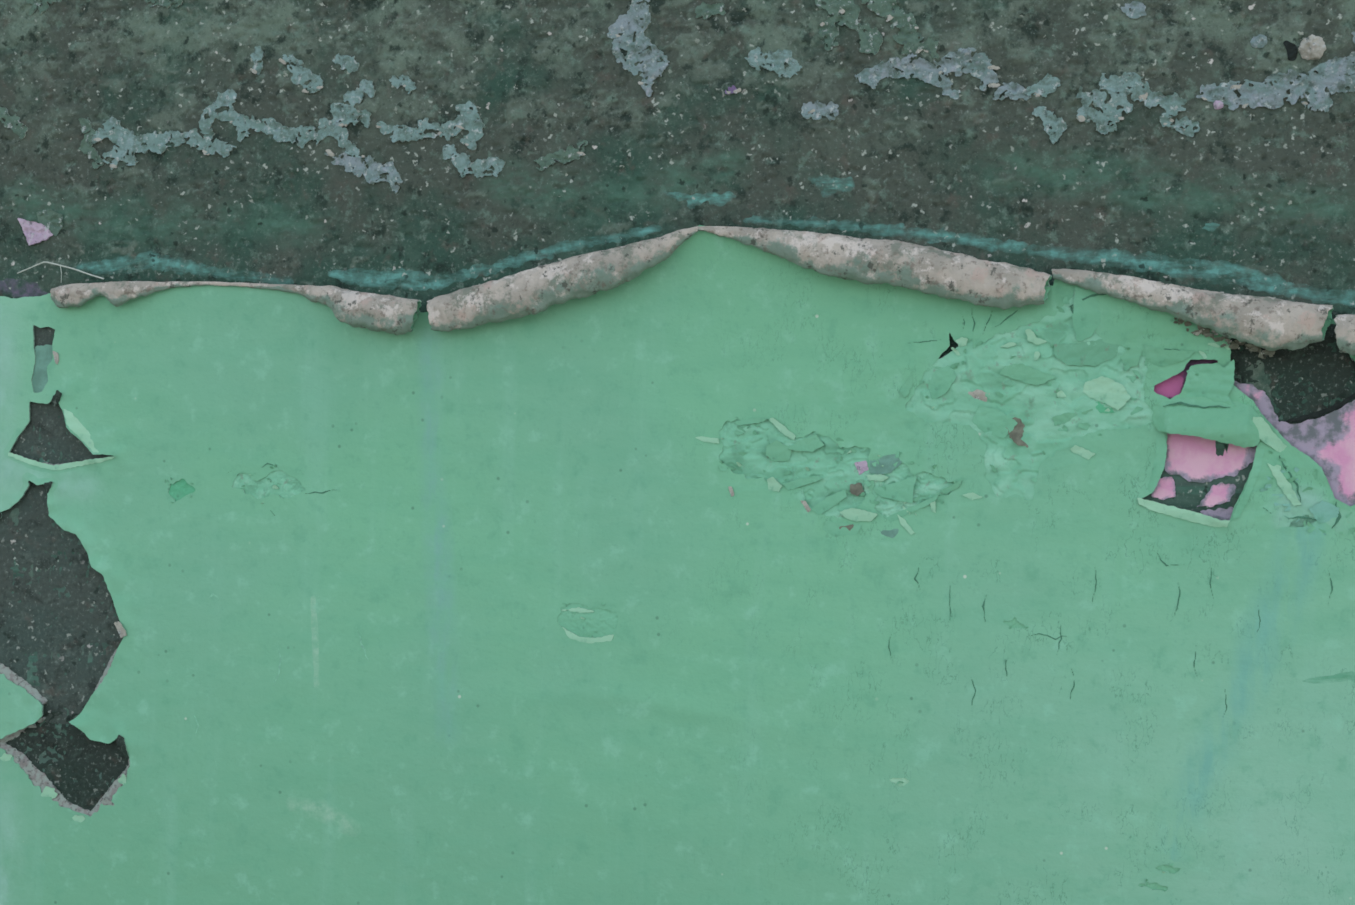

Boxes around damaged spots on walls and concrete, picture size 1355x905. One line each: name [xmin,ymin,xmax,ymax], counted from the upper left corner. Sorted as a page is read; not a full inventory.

spalling [1283,40,1298,61]
peeling [695,287,1355,538]
peeling [0,326,130,822]